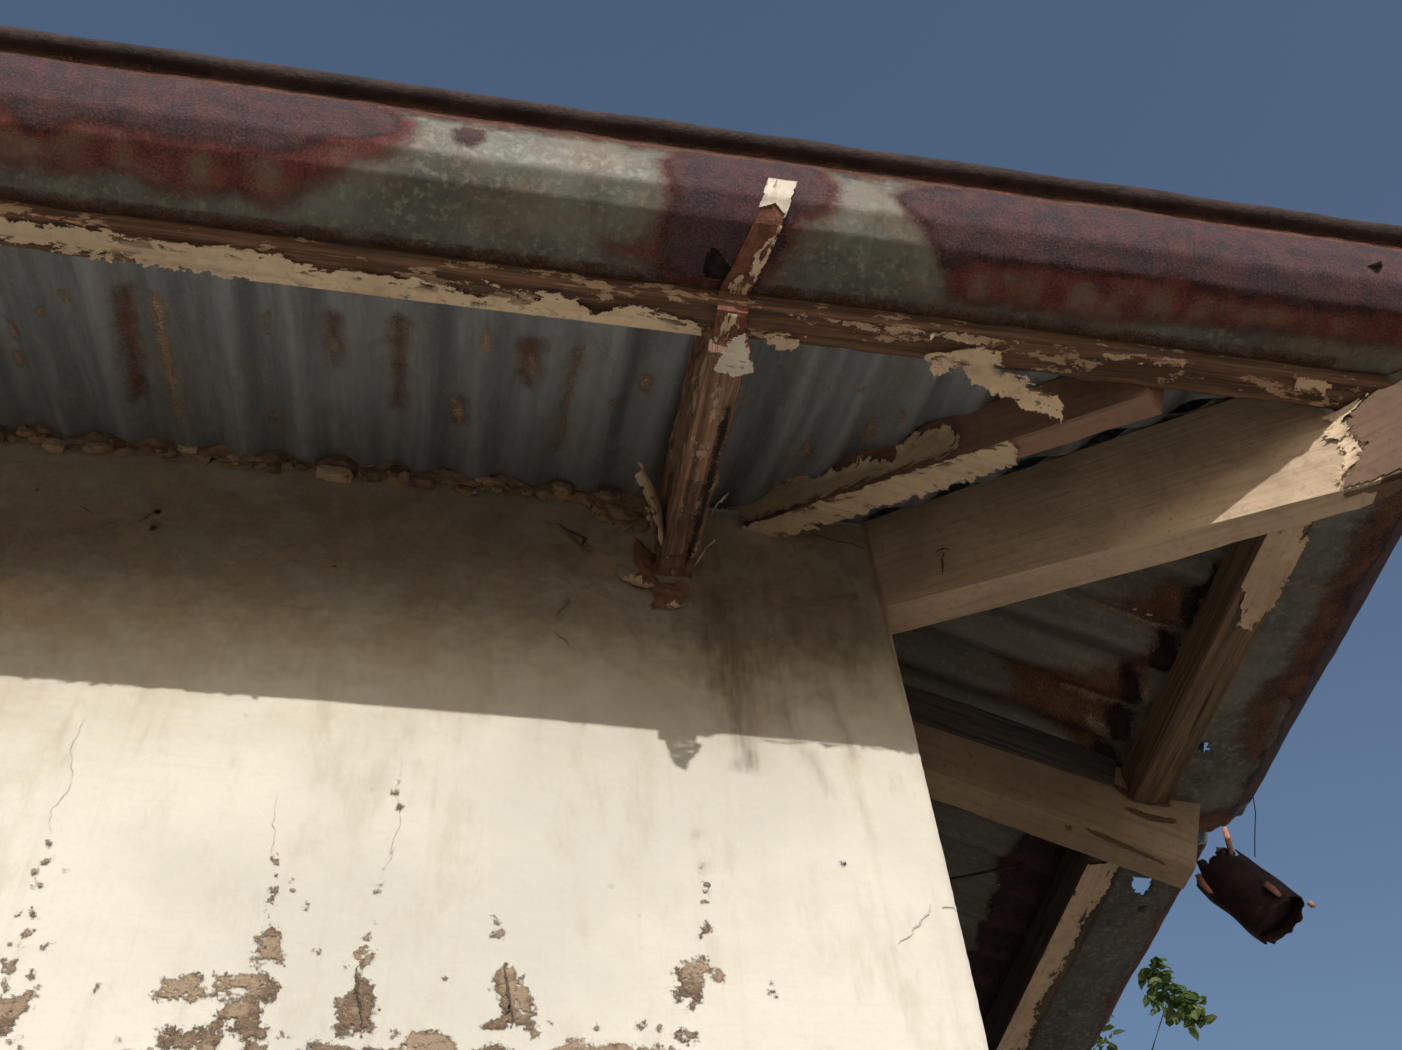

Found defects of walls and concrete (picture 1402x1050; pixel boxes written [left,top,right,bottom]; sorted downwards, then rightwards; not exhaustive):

peeling [0,217,1064,423]
rust [0,47,1402,368]
peeling [728,178,797,295]
peeling [0,406,1019,610]
rust [989,559,1220,767]
rust [1196,489,1402,863]
spalling [0,906,56,1050]
spalling [30,839,70,887]
spalling [148,852,700,1050]
spalling [670,864,725,1012]
rust [967,832,1068,1023]
peeling [997,863,1119,1050]